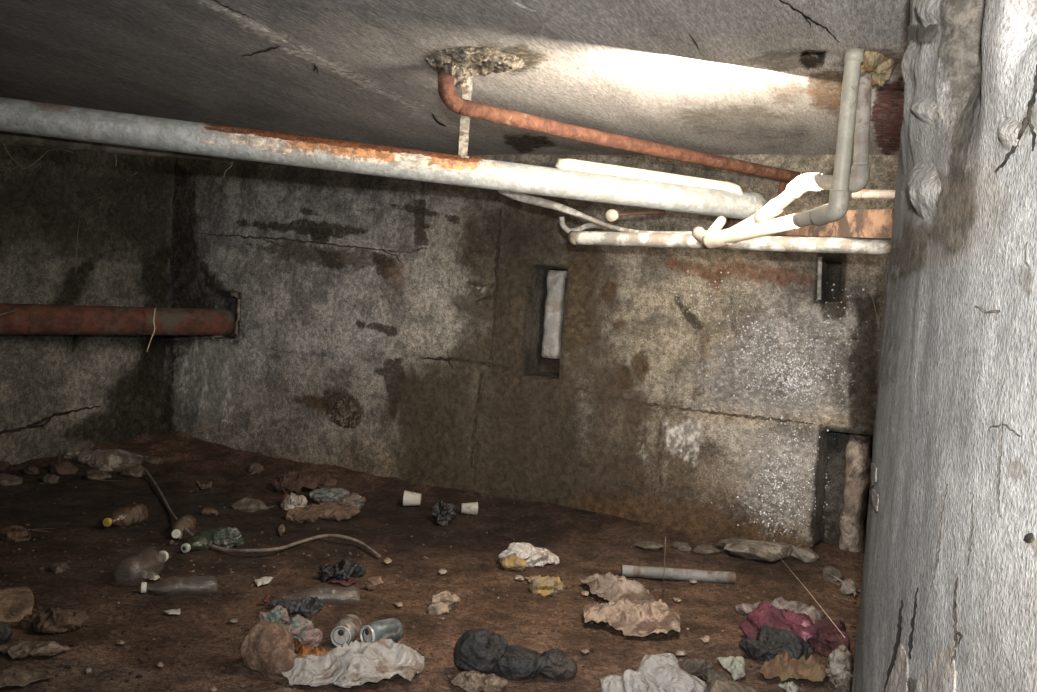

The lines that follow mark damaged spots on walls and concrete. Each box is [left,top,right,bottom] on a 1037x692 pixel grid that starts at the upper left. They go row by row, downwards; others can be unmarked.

corrosion [204,123,486,170]
crack [994,65,1037,172]
damp [237,208,397,278]
damp [139,335,238,431]
crack [0,406,101,434]
damp [740,429,819,534]
peeling [884,642,956,692]